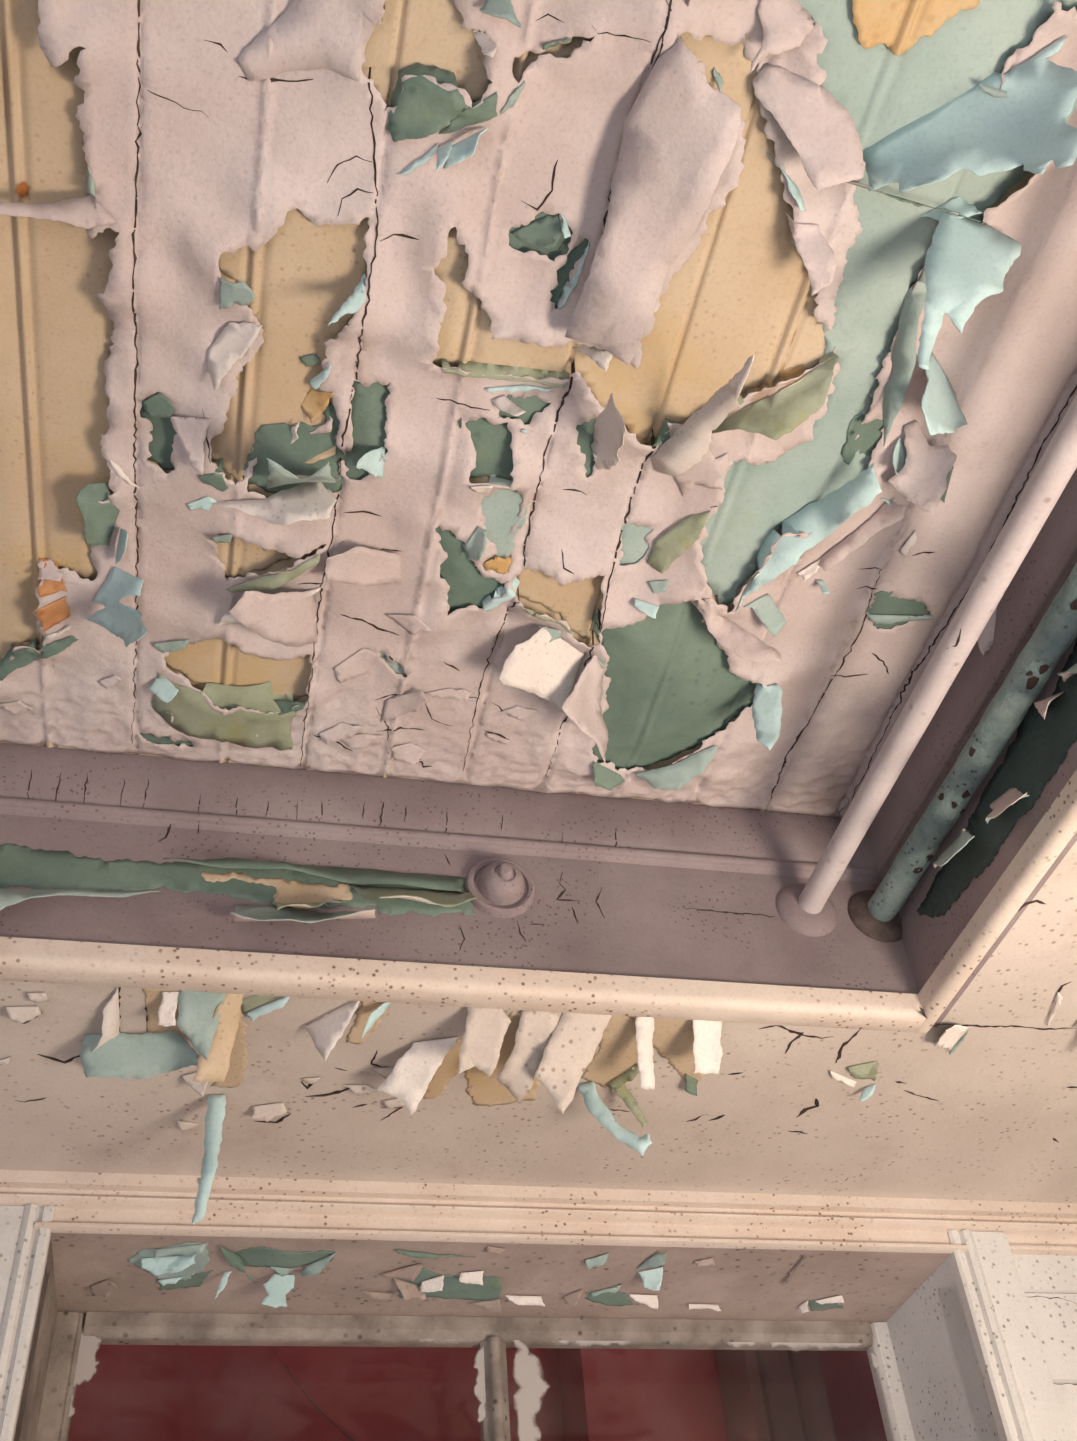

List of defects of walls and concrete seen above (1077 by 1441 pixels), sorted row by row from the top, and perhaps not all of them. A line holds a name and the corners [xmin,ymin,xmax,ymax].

crack [205,40,314,82]
peeling [235,0,595,175]
crack [536,0,672,69]
crack [131,0,209,744]
peeling [0,0,407,751]
crack [300,67,587,776]
peeling [432,0,1077,791]
crack [584,428,656,667]
peeling [0,843,477,923]
crack [517,837,605,941]
peeling [79,987,290,1225]
peeling [342,1007,723,1156]